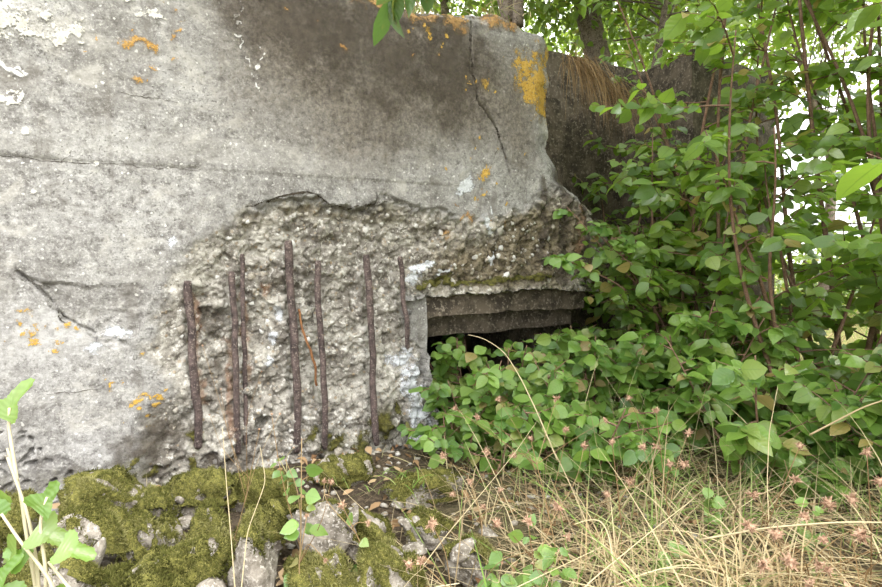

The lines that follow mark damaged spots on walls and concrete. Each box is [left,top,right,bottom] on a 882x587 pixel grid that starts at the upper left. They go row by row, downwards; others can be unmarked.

peeling [456,175,474,196]
crack [469,33,503,163]
rust [183,281,203,449]
rust [228,254,248,454]
rust [284,240,328,453]
spalling [17,182,599,488]